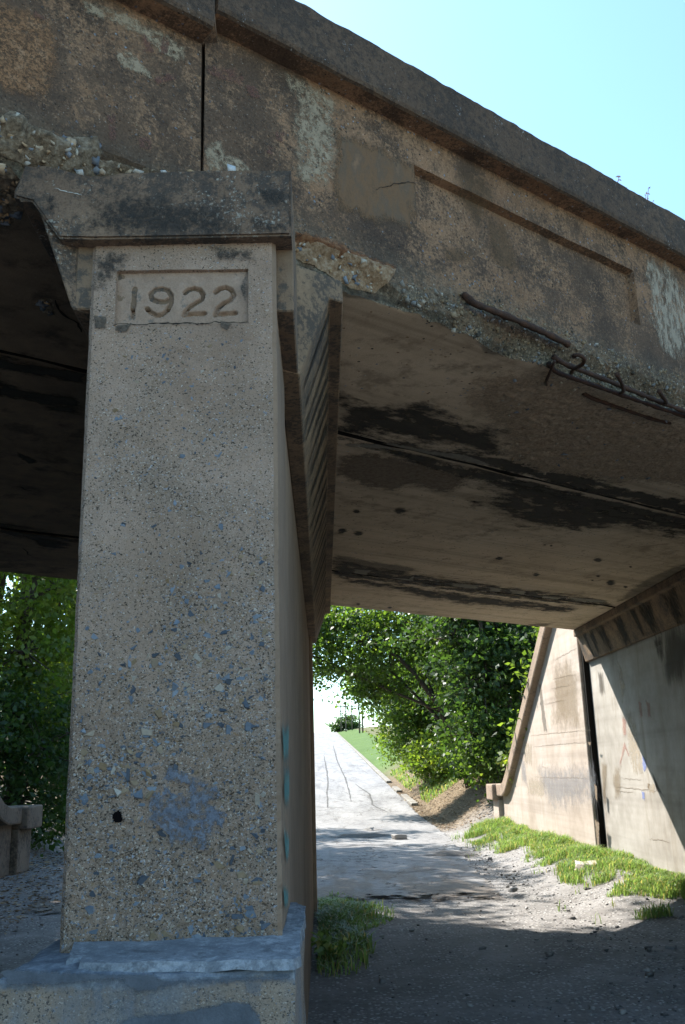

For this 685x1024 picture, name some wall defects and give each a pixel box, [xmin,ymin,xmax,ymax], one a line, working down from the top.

spalling [0,111,166,228]
spalling [295,237,685,485]
damp [304,311,685,627]